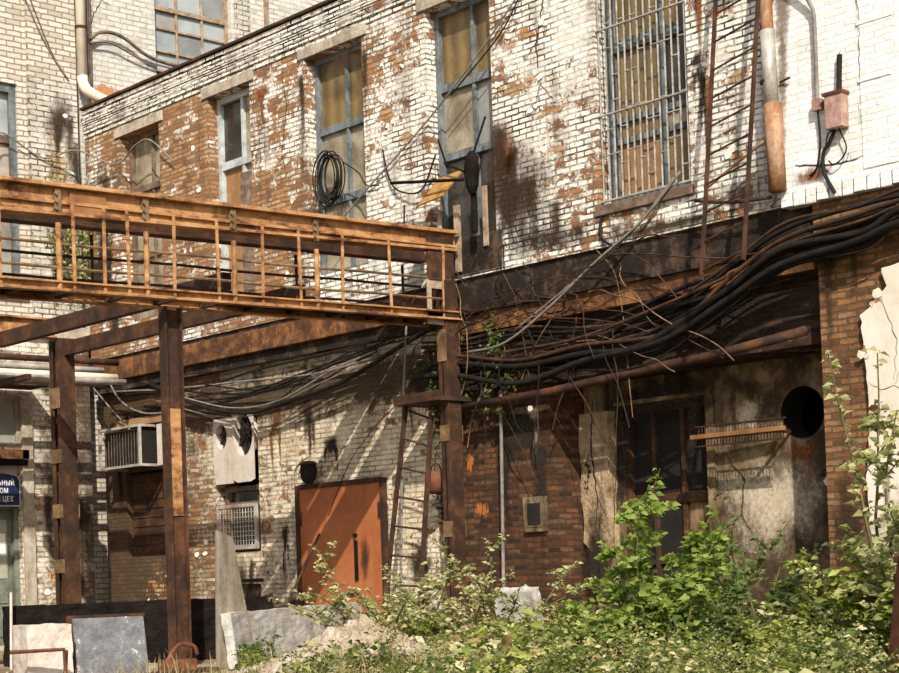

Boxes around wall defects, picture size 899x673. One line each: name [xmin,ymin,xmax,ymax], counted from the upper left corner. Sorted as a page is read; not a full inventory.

peeling [503,17,547,49]
peeling [494,68,543,103]
peeling [527,101,570,119]
rust [692,0,712,139]
water stain [54,119,80,185]
peeling [263,142,295,210]
water stain [488,123,582,253]
water stain [94,232,112,284]
flaking render [869,287,882,307]
crack [869,302,899,390]
water stain [304,406,314,449]
water stain [724,468,817,542]